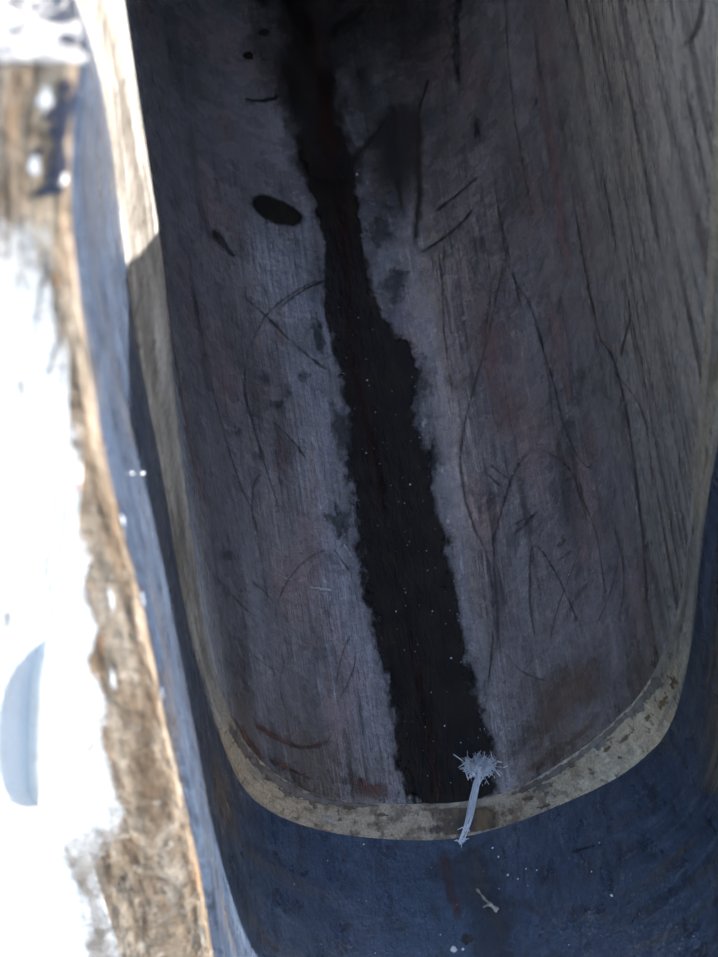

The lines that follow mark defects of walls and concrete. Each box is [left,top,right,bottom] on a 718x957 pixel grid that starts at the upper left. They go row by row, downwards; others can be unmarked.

peeling [29,78,77,196]
peeling [0,221,123,957]
peeling [53,0,87,50]
damp [246,80,497,804]